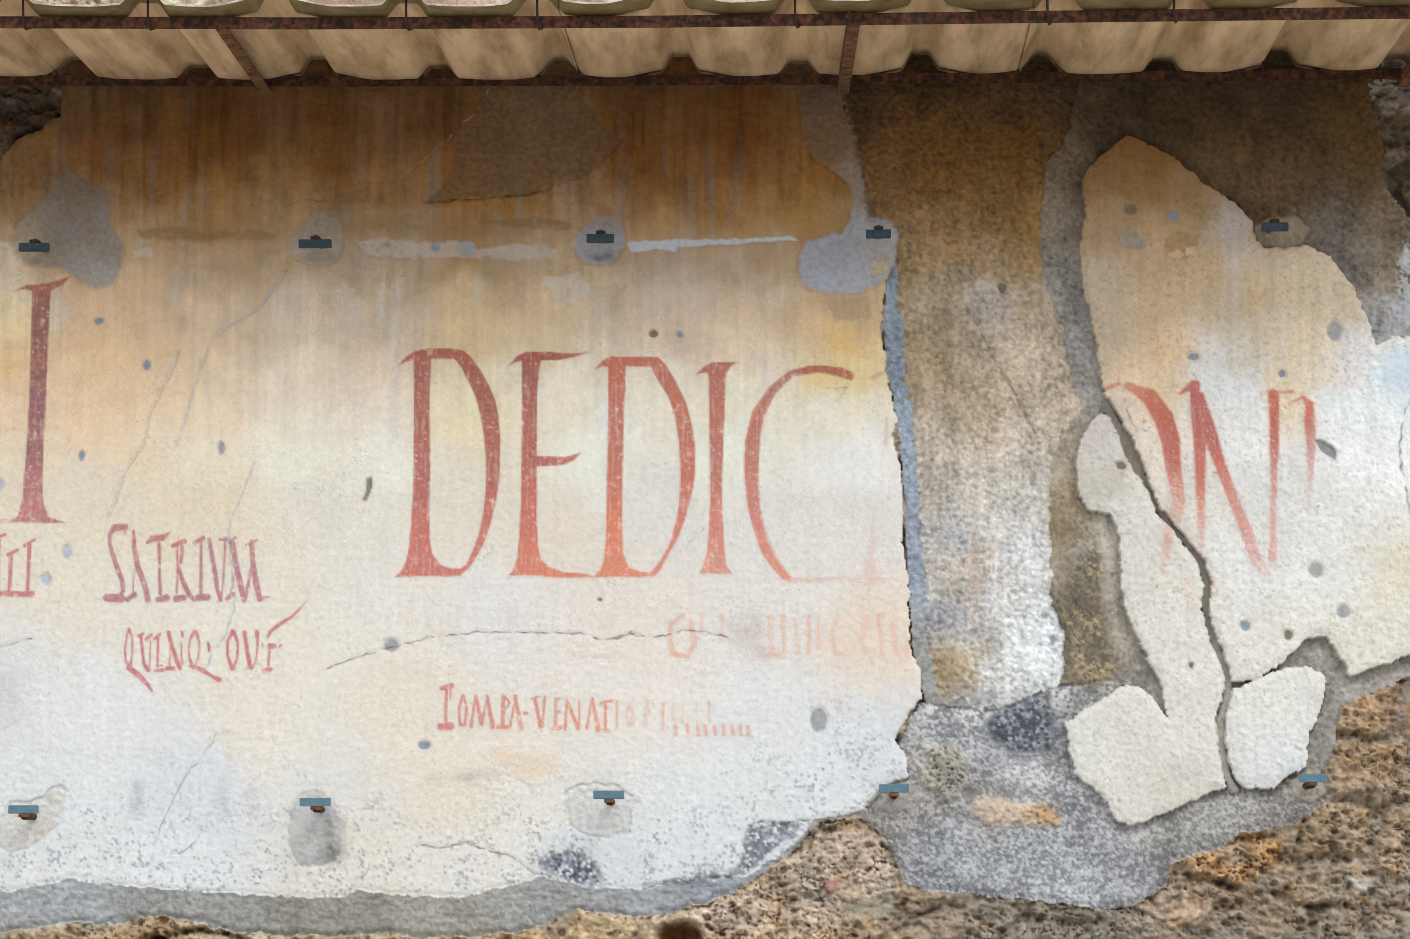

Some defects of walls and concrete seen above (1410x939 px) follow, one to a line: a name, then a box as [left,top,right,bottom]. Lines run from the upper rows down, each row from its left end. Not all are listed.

flaking render [997,281,1009,294]
crack [1098,396,1240,796]
crack [326,629,728,670]